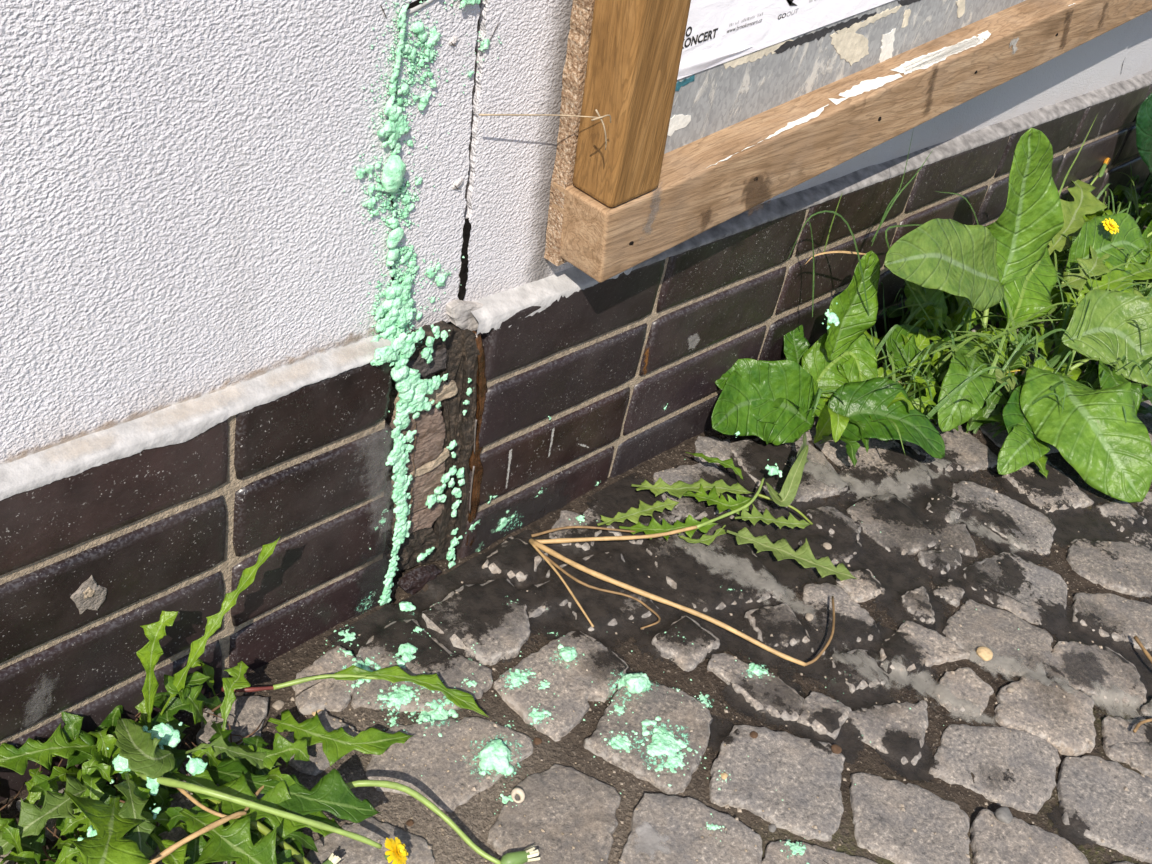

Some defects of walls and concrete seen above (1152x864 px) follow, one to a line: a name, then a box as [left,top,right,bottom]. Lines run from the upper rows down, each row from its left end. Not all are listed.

peeling [397,21,437,111]
crack [457,3,481,301]
spalling [0,70,1152,573]
spalling [70,575,107,614]